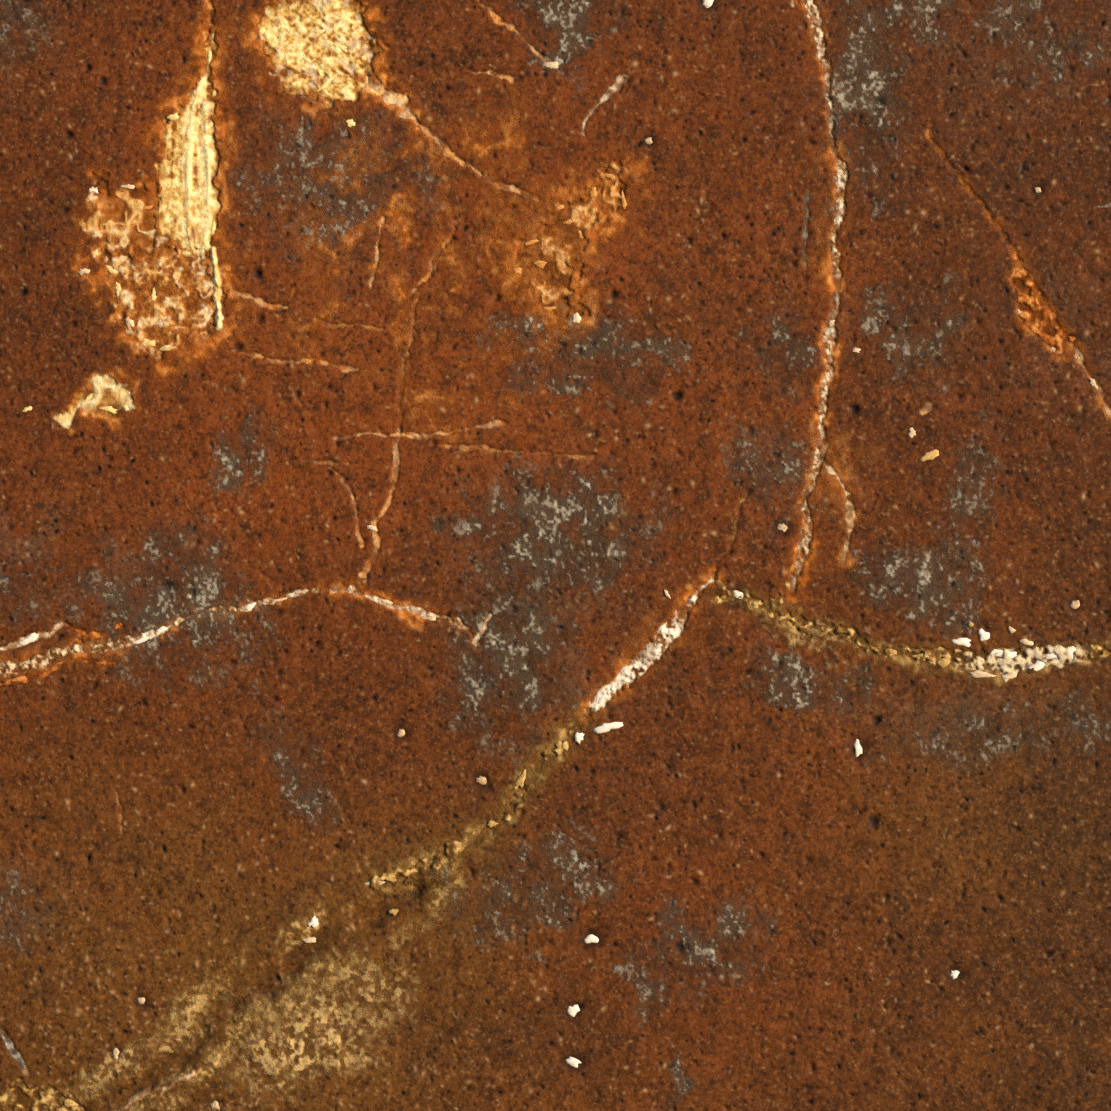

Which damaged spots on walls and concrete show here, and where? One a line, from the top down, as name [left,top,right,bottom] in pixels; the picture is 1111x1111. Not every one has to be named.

peeling [241,0,422,135]
rust [463,120,525,157]
peeling [72,0,243,377]
rust [314,192,413,269]
rust [484,220,534,287]
peeling [55,368,140,434]
crack [364,0,1111,937]
crack [0,581,492,685]
water stain [764,650,821,709]
water stain [528,835,611,927]
crack [116,906,355,1111]
crack [0,1033,95,1111]